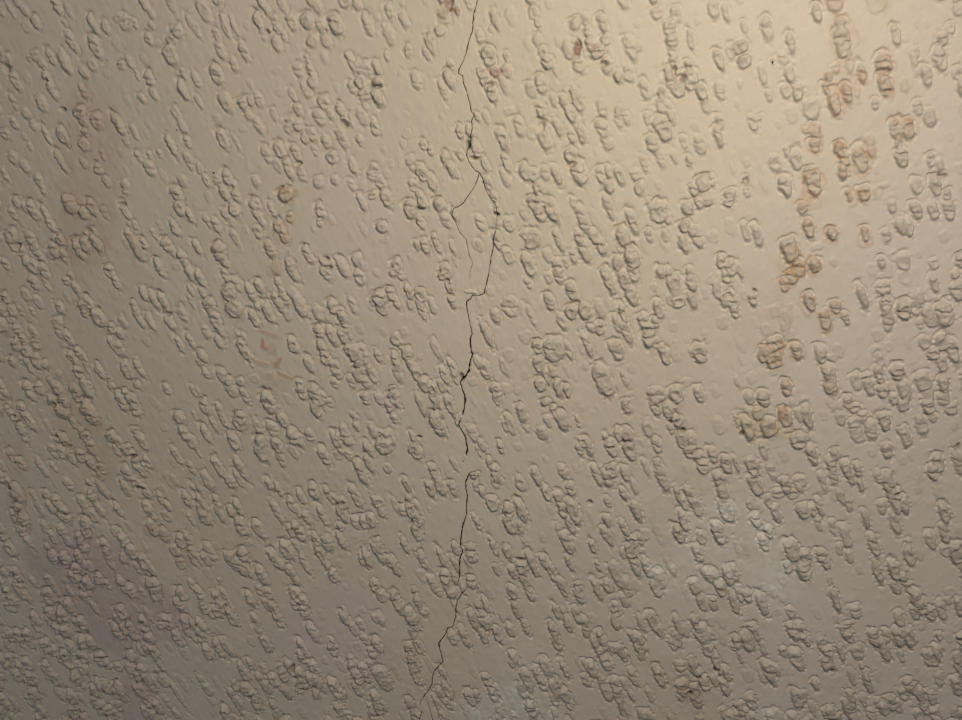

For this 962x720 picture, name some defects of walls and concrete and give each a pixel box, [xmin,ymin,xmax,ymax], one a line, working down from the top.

crack [419,0,498,720]